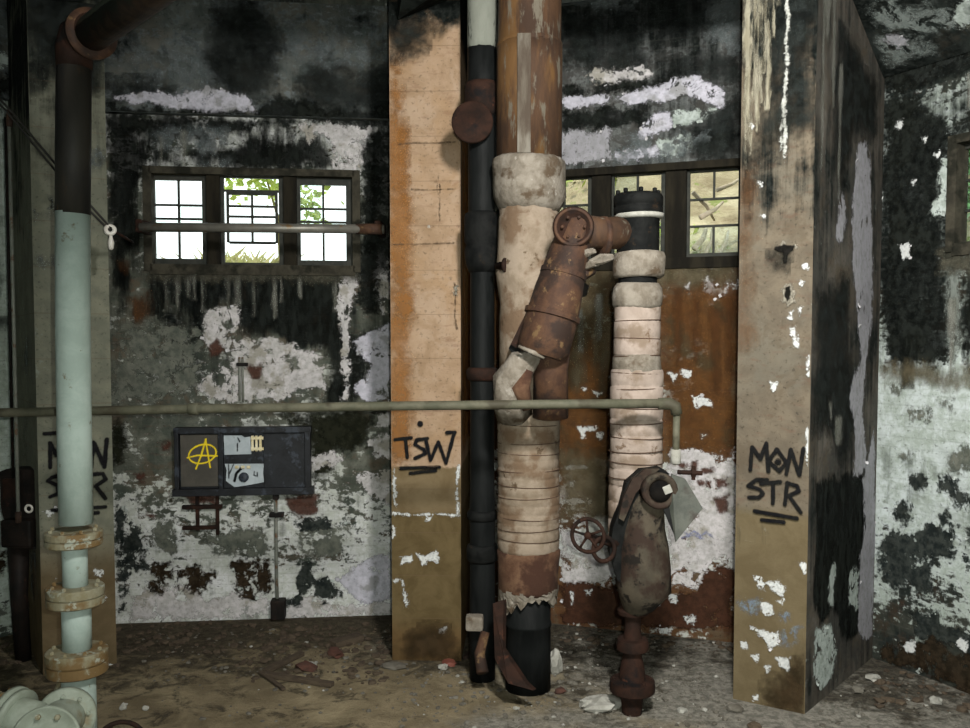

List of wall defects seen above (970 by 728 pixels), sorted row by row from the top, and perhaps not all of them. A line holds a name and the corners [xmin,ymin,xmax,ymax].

peeling [562,64,725,165]
water stain [742,0,791,158]
water stain [146,273,358,341]
peeling [197,305,327,404]
peeling [334,260,460,539]
rust [559,329,611,484]
rust [661,289,738,456]
water stain [829,403,842,444]
peeling [836,141,970,694]
water stain [887,269,970,389]
peeling [105,504,274,622]
water stain [765,661,805,713]